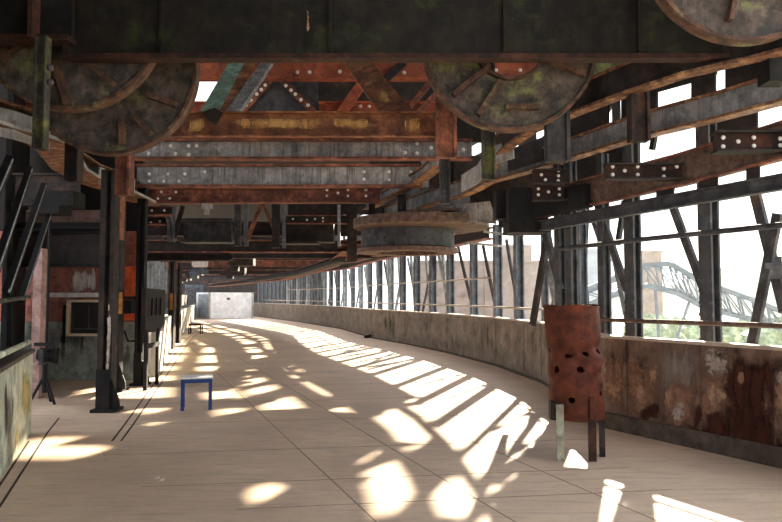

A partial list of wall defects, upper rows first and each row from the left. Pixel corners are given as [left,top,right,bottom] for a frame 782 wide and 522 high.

rust [237,119,316,129]
rust [334,119,368,128]
rust [405,119,419,131]
peeling [71,268,96,293]
peeling [703,347,728,374]
rust [627,348,782,447]